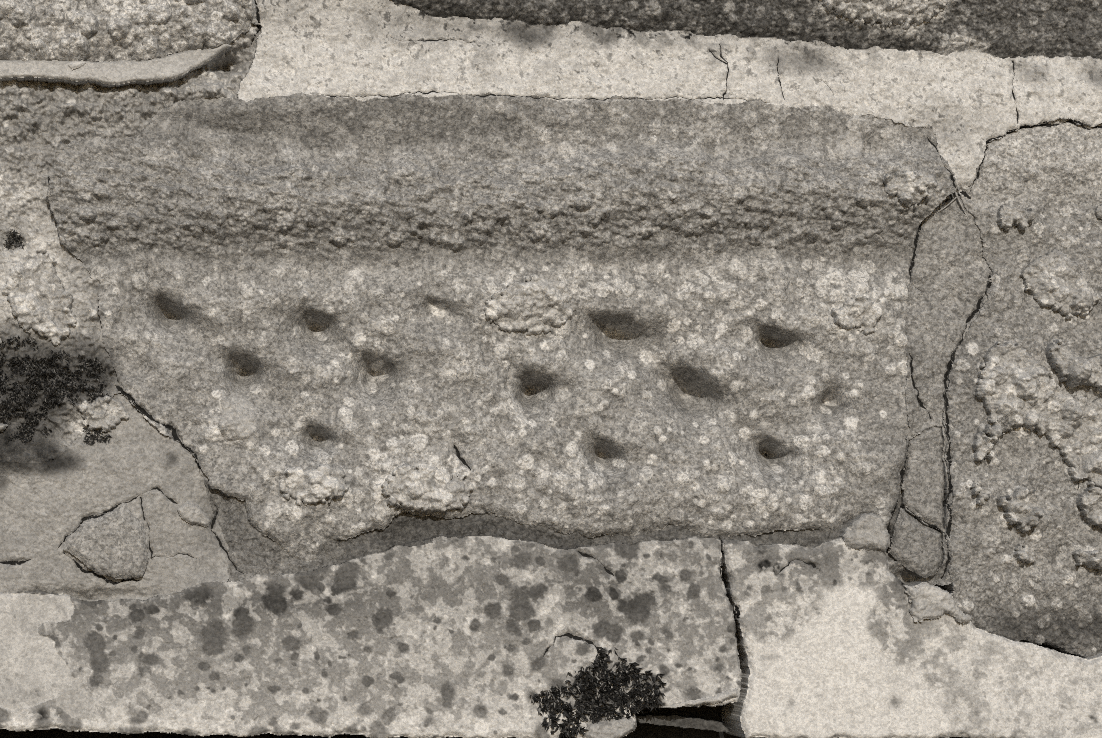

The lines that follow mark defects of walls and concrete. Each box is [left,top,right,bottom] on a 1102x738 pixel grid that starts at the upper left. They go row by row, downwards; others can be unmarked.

crack [909,61,1102,291]
crack [0,558,31,566]
crack [58,487,197,585]
crack [115,385,244,574]
crack [719,537,740,637]
crack [886,275,992,579]